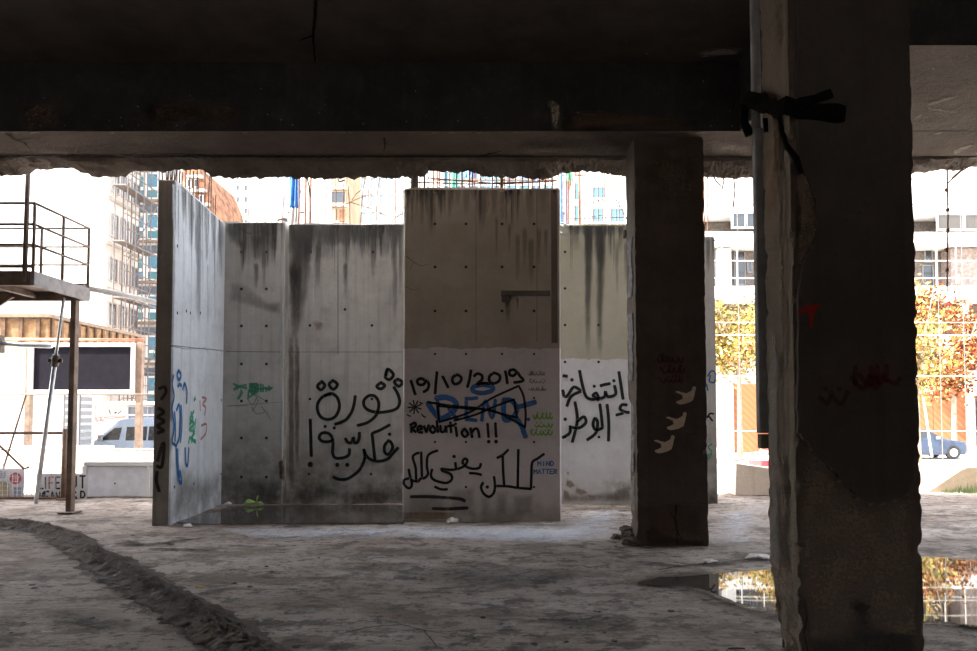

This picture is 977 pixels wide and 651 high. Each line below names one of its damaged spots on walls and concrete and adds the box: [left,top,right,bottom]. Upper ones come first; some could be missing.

crack [299,0,318,62]
spalling [419,171,553,189]
leakage [572,225,621,299]
leakage [173,185,401,474]